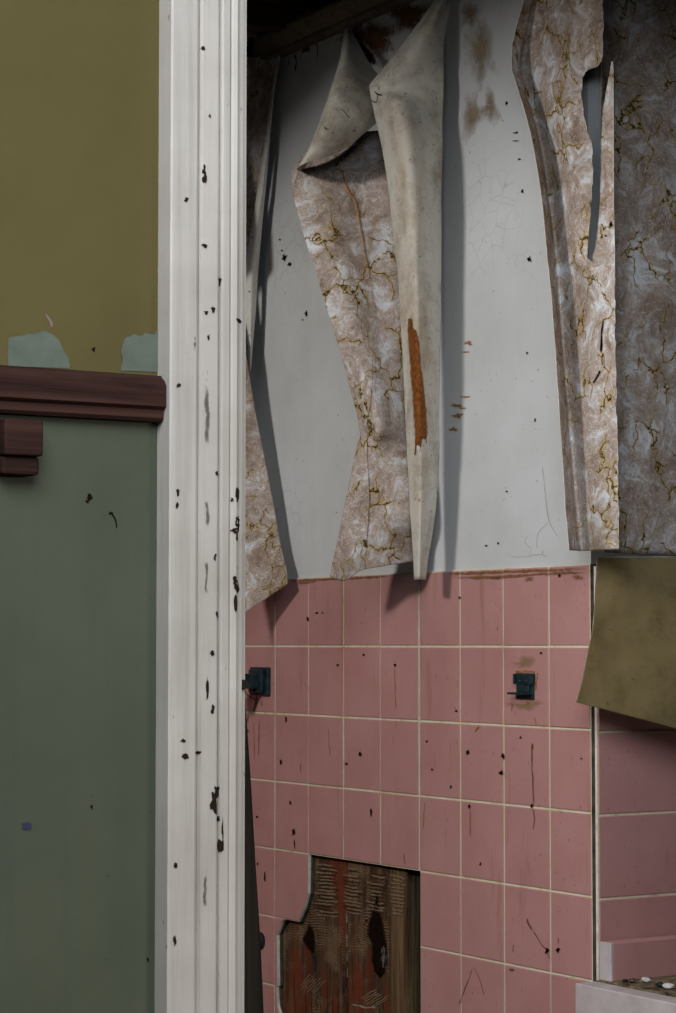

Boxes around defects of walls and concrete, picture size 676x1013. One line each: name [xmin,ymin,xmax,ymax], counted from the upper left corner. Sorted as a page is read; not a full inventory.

damp [468,97,493,126]
peeling [7,314,70,368]
peeling [121,330,158,372]
spalling [303,925,316,972]
spalling [367,897,387,977]